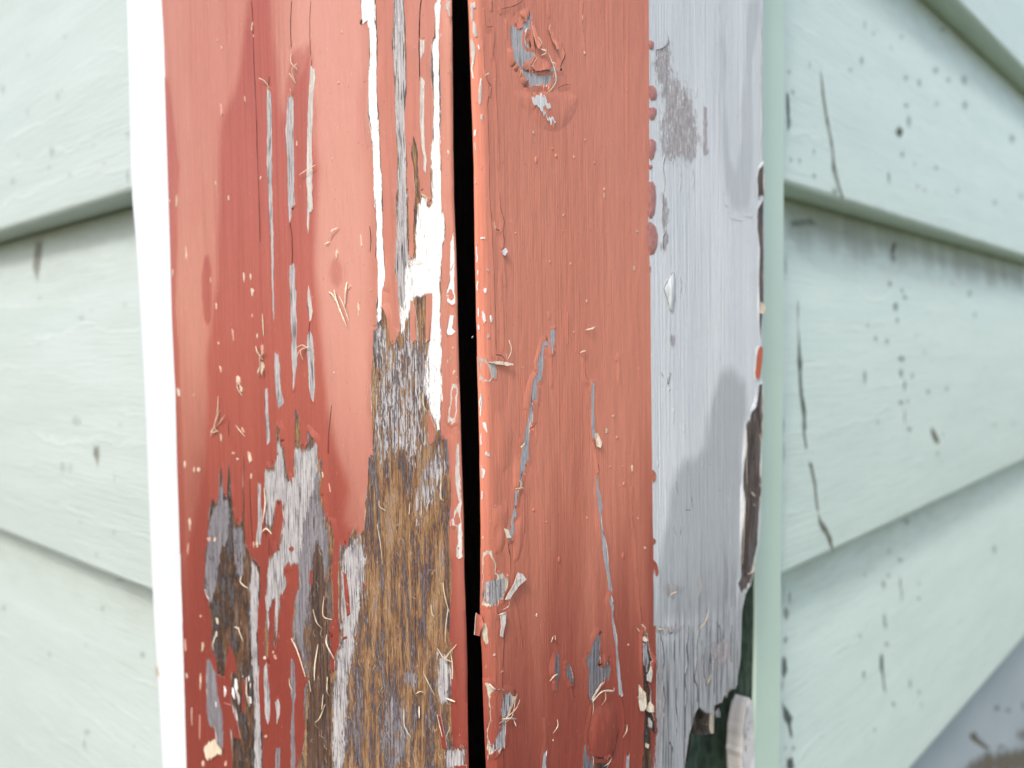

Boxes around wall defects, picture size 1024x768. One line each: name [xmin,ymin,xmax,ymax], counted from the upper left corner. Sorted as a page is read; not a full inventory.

peeling [470,2,483,150]
peeling [506,7,577,134]
peeling [753,15,766,382]
peeling [186,0,469,768]
peeling [474,312,558,768]
peeling [549,371,658,768]
peeling [726,694,755,768]